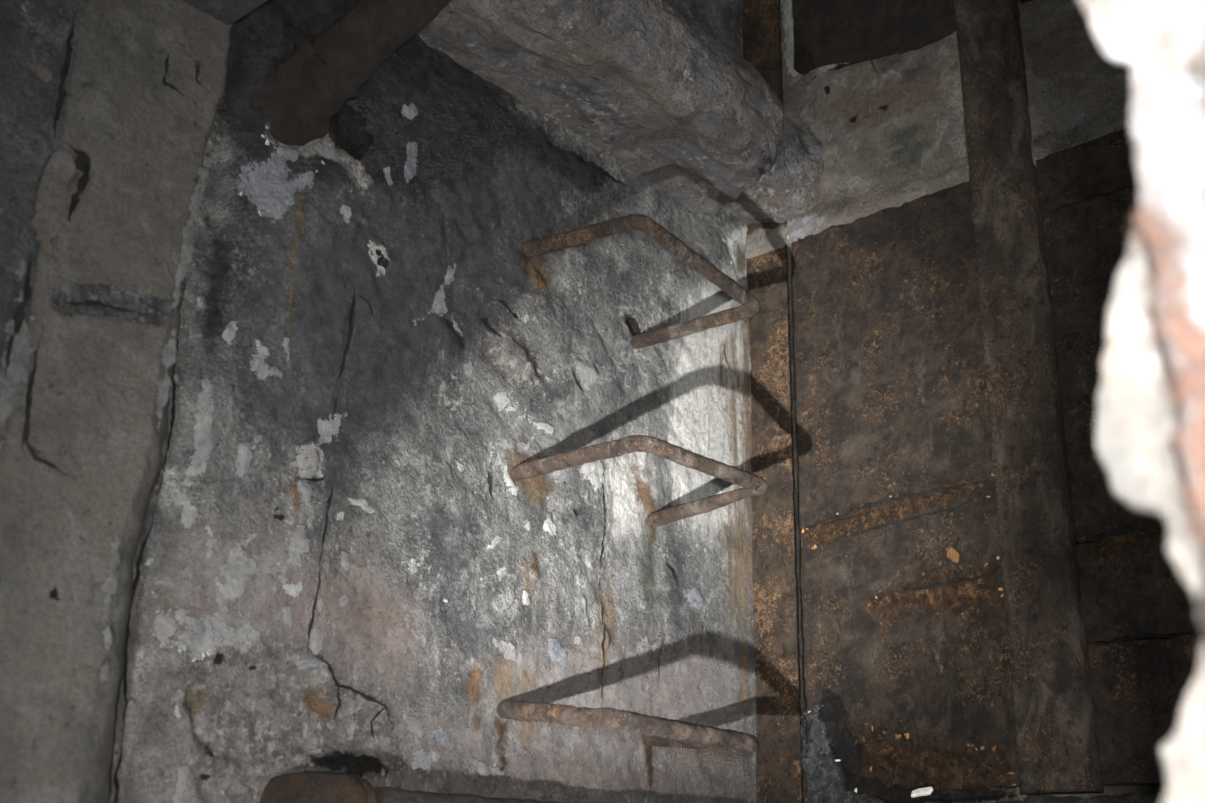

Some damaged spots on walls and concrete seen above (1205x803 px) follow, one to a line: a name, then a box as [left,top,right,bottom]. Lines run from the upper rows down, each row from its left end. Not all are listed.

peeling [401,103,418,120]
peeling [233,121,418,224]
corrosion [626,466,659,541]
crack [307,478,392,740]